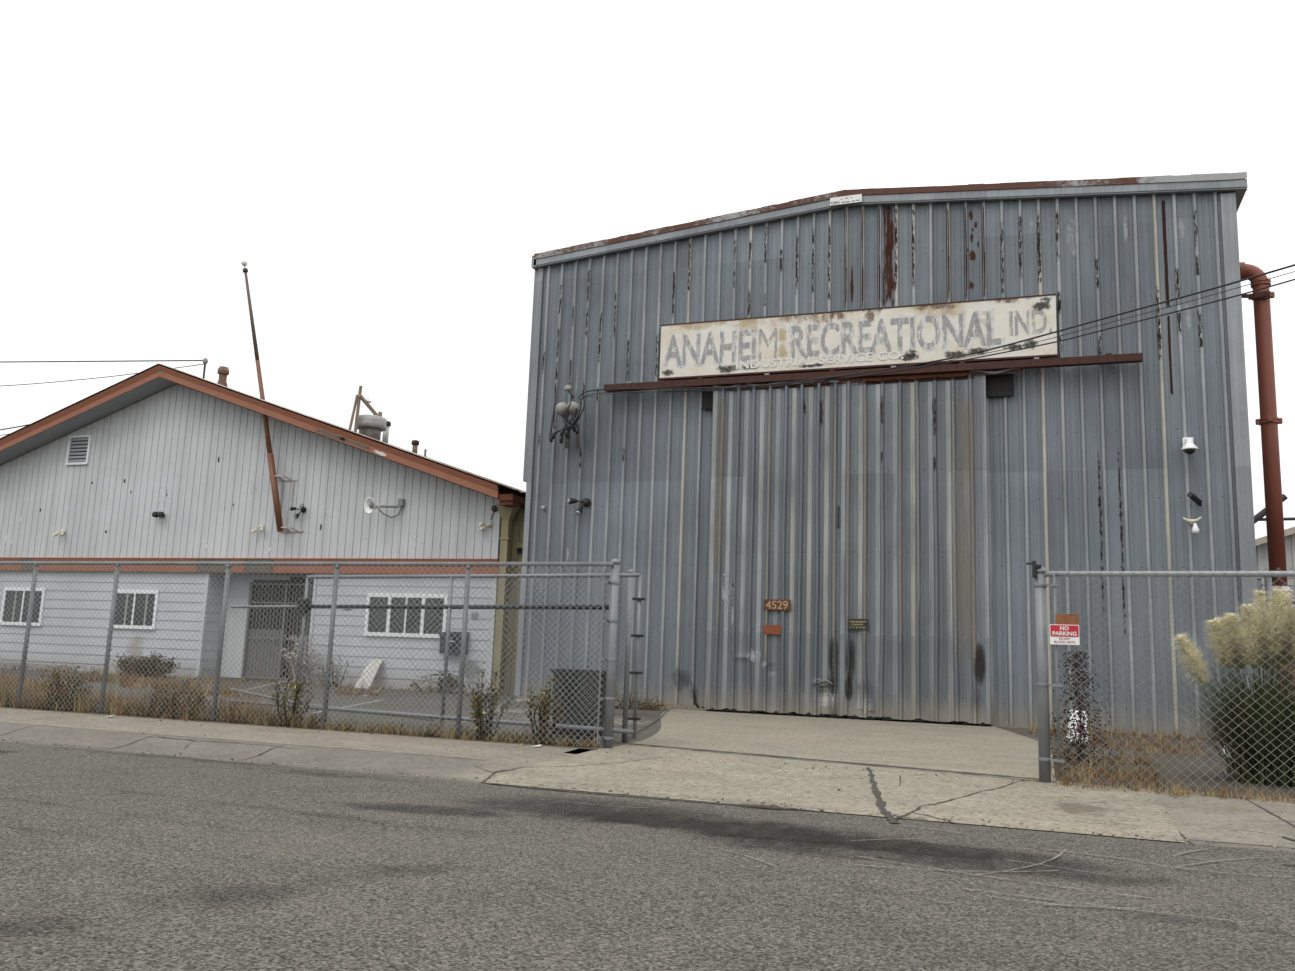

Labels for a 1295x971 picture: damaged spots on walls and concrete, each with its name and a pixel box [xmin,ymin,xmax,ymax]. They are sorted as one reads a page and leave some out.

rust [786,207,895,323]
peeling [945,348,987,357]
rust [1162,200,1173,394]
crack [866,767,1024,826]